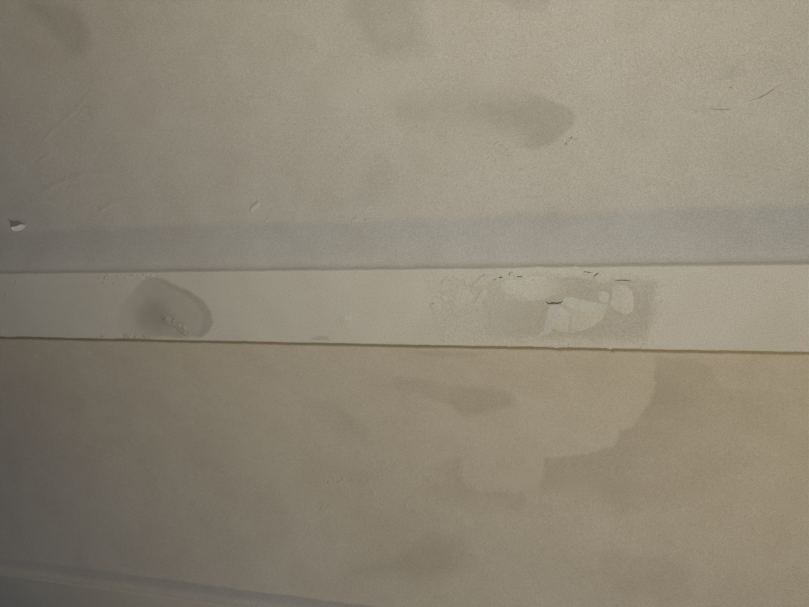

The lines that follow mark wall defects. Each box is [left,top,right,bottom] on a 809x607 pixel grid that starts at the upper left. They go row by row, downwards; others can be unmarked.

flaking render [425,266,666,349]